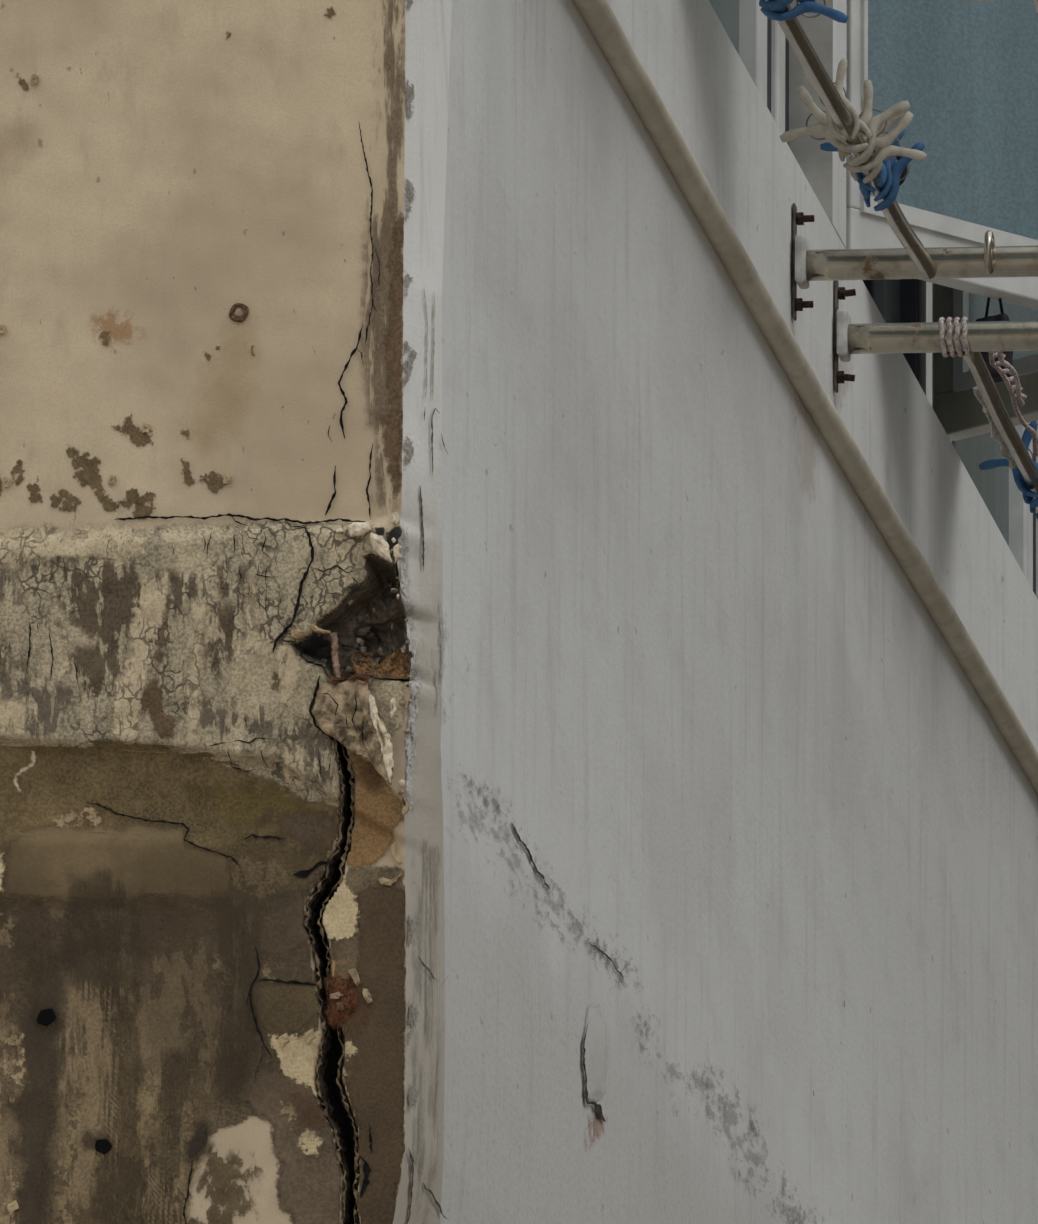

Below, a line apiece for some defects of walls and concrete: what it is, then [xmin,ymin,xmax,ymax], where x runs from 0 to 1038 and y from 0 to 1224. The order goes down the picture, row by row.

spalling [405,81,415,118]
peeling [111,414,153,447]
crack [114,123,380,654]
peeling [380,179,417,493]
leakage [0,557,141,791]
leakage [169,565,246,676]
peeling [0,444,422,903]
crack [87,802,284,865]
flaking render [252,984,322,1044]
crack [207,675,372,1224]
flaking render [235,1066,343,1224]
crack [406,1150,447,1224]